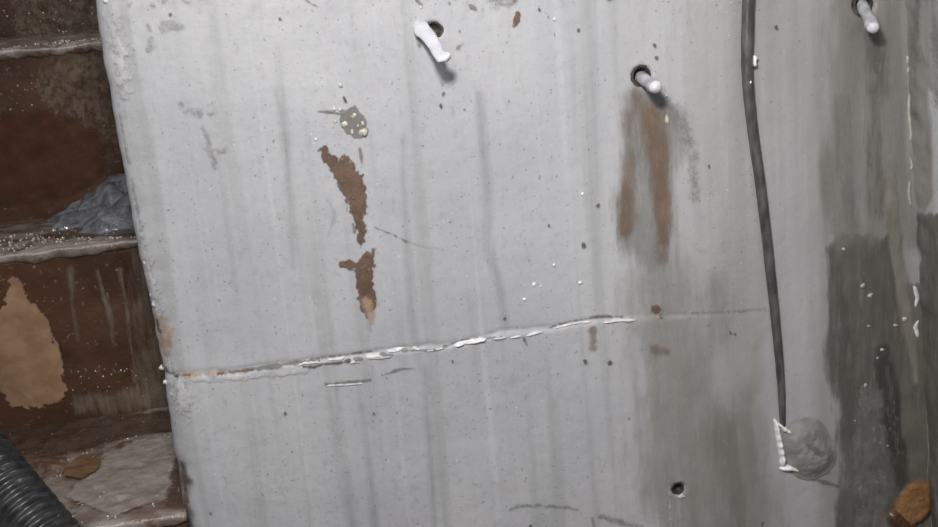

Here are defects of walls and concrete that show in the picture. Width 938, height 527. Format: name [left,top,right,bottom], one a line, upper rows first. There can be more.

corrosion [620,93,690,260]
damp [822,0,938,527]
crack [177,315,637,387]